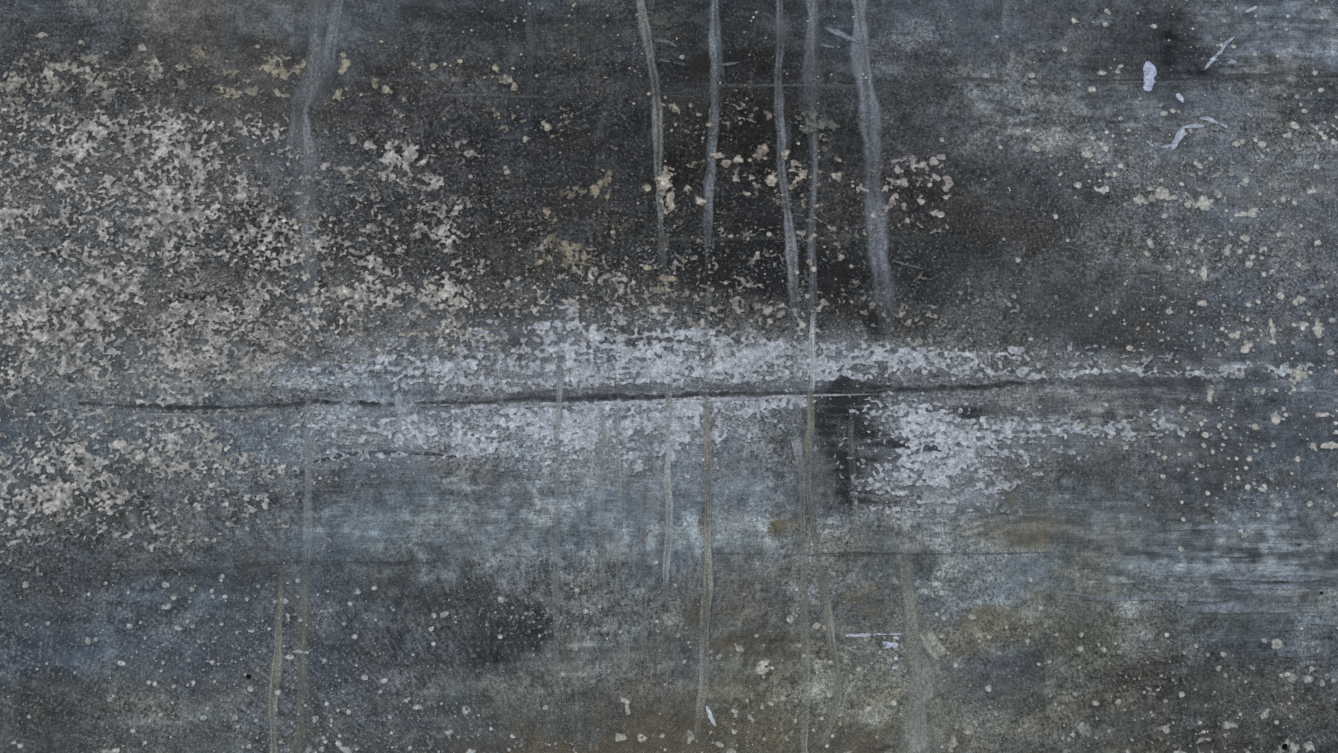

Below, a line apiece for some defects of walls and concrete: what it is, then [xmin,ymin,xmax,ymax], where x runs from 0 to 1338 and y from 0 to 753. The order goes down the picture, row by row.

damp [637,0,686,252]
crack [23,377,1172,417]
damp [689,0,946,753]
damp [953,407,982,418]
damp [269,582,283,753]